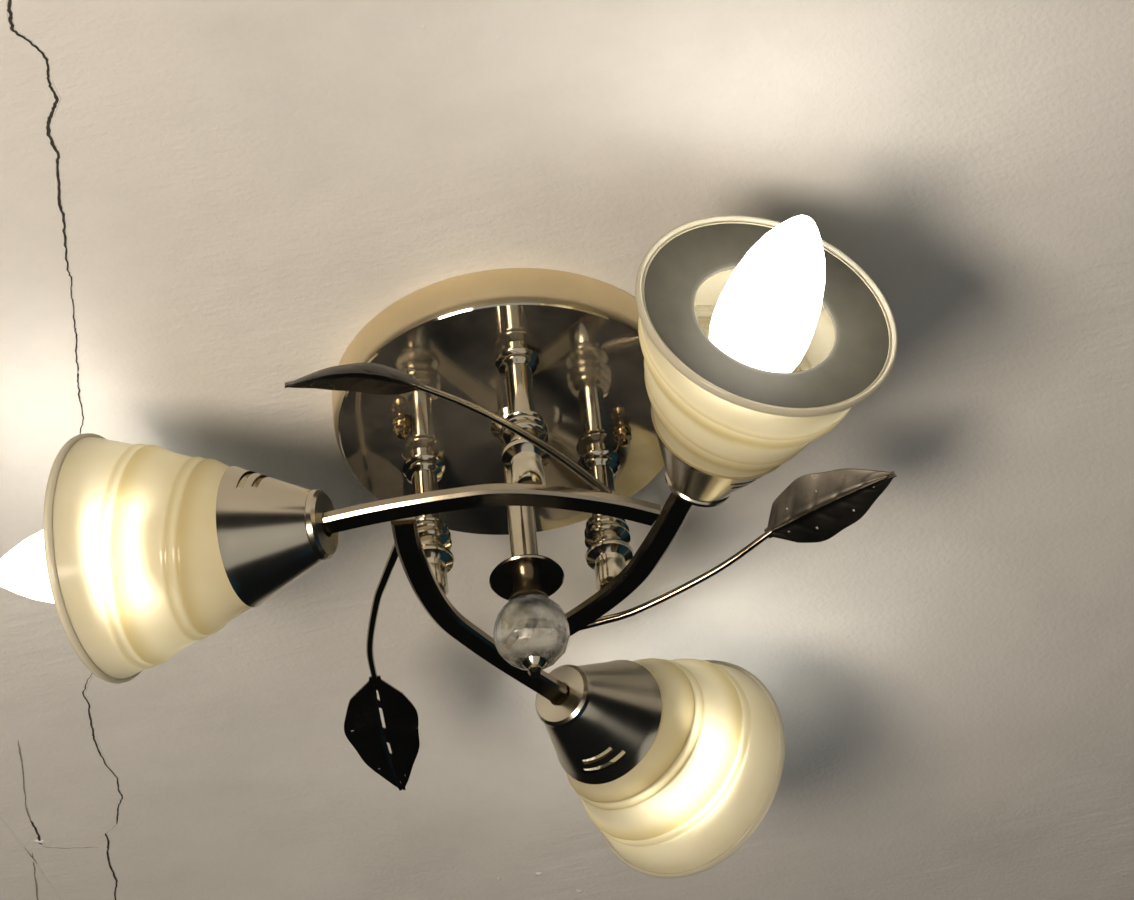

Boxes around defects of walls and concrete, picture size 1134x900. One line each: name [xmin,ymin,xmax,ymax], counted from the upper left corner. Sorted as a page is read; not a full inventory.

crack [5,0,84,434]
crack [18,673,123,900]